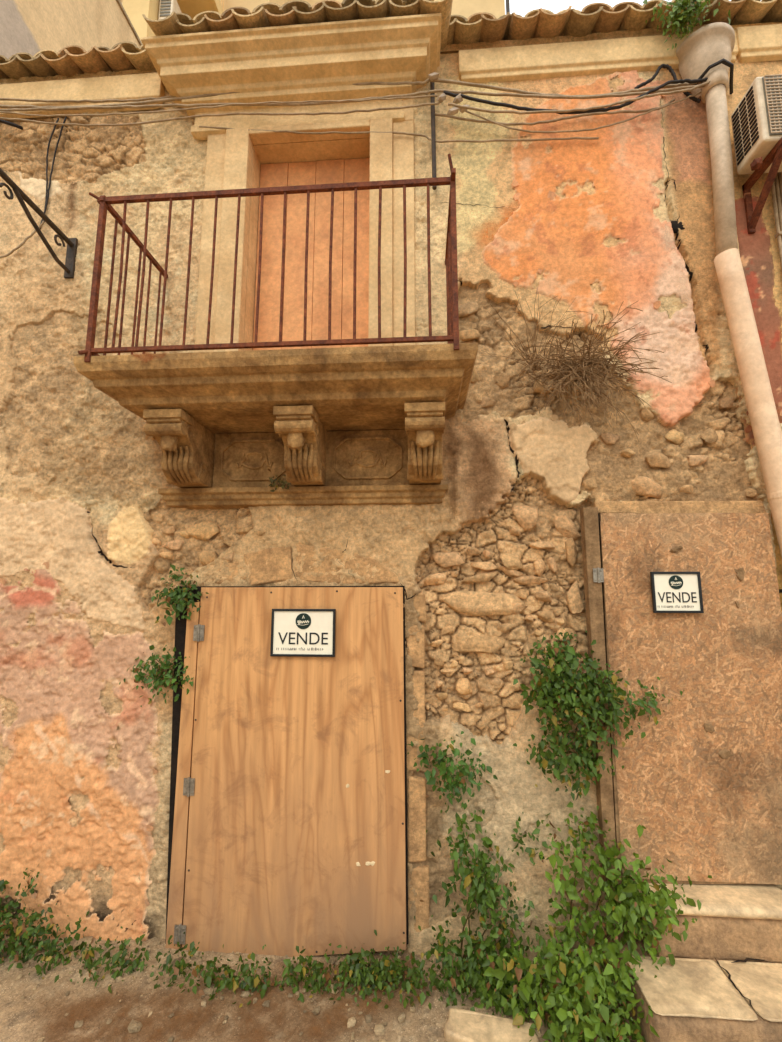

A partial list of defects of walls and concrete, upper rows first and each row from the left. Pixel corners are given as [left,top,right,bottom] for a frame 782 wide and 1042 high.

crack [659,72,693,281]
crack [504,419,523,492]
peeling [415,70,760,744]
peeling [735,192,782,423]
peeling [0,562,160,941]